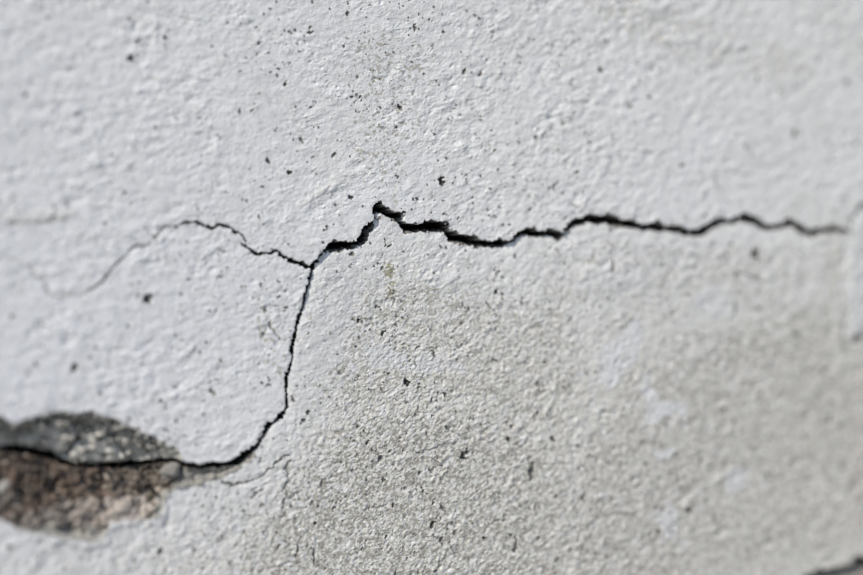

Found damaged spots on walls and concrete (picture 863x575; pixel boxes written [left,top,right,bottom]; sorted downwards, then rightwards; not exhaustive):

spalling [0,410,242,543]
crack [0,201,863,508]